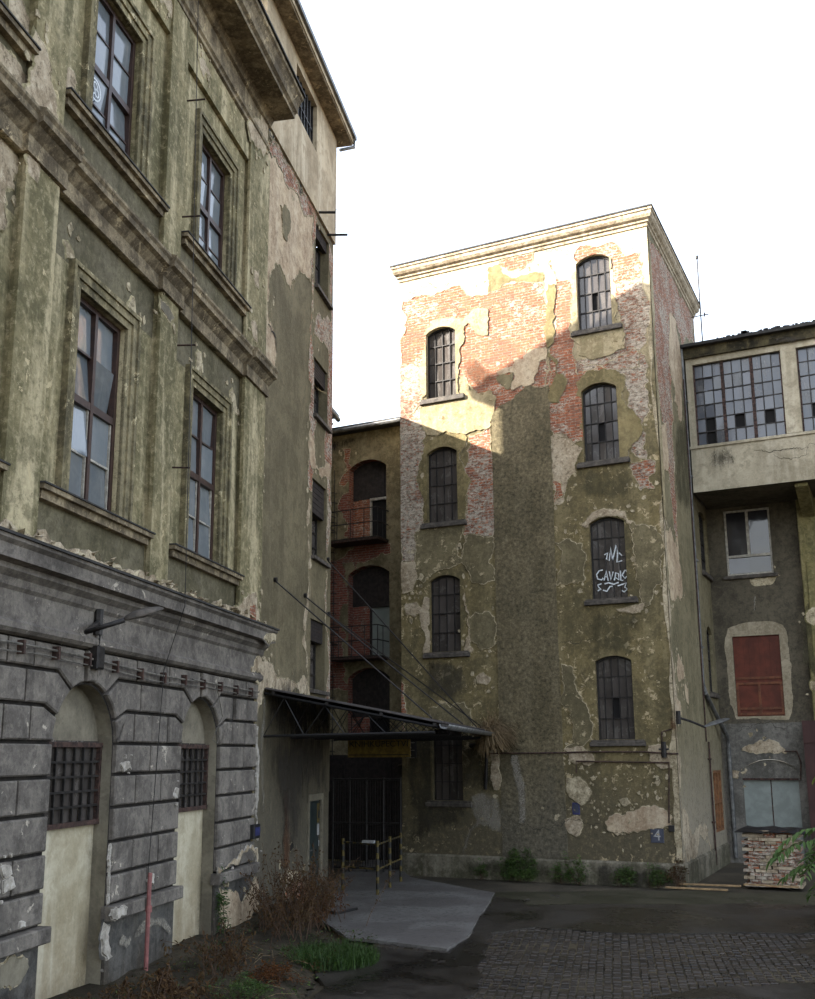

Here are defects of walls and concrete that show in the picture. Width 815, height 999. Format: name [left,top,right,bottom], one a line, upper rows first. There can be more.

flaking render [0,104,712,863]
peeling [0,853,16,905]
spalling [98,843,128,972]
flaking render [216,838,265,929]